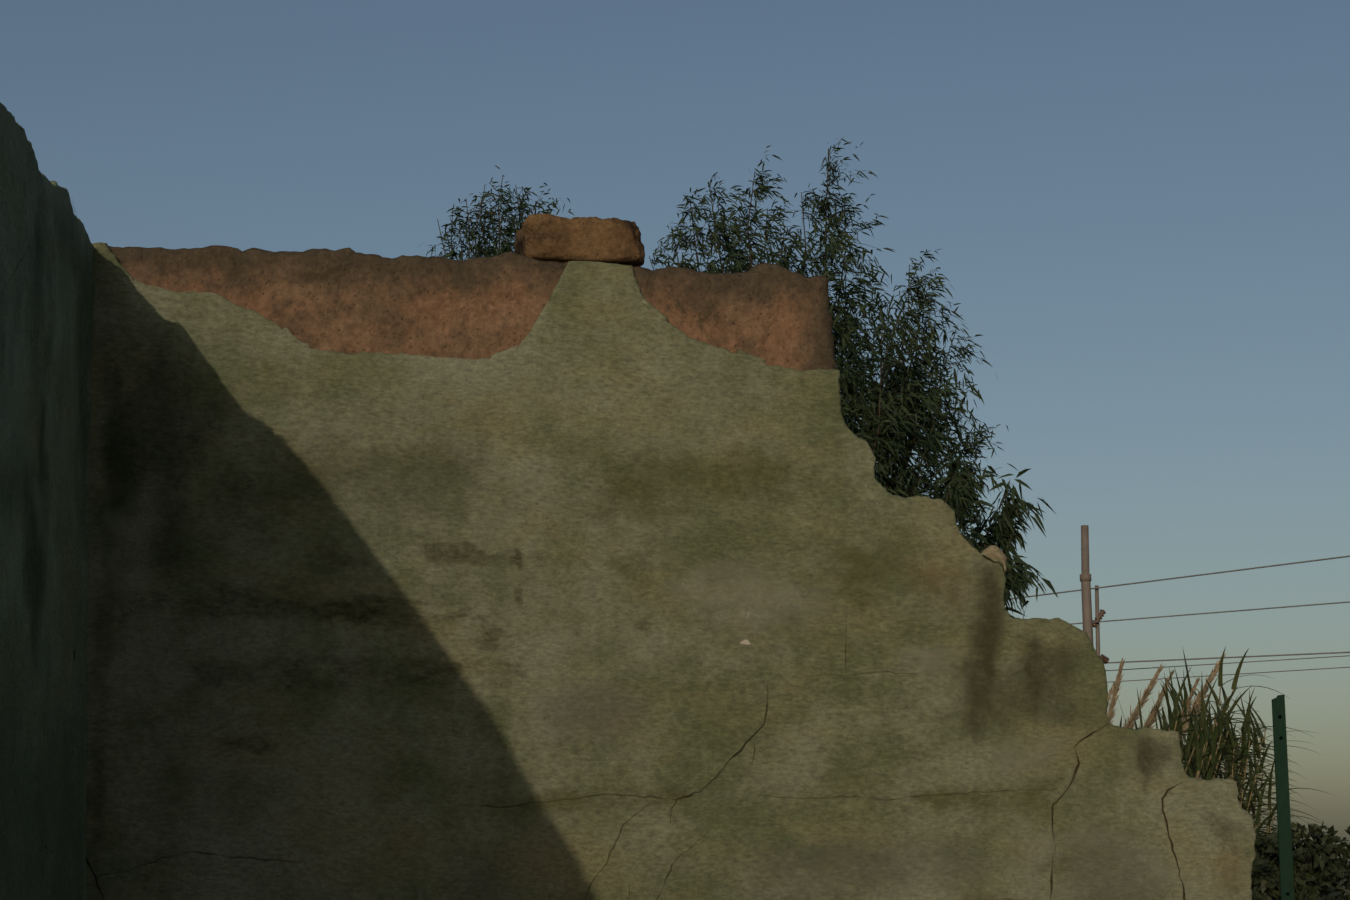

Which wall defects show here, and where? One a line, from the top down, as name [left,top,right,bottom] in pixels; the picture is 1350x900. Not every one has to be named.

spalling [108,245,568,360]
spalling [633,263,837,371]
crack [589,689,768,900]
crack [1050,731,1095,900]
crack [1161,782,1185,900]